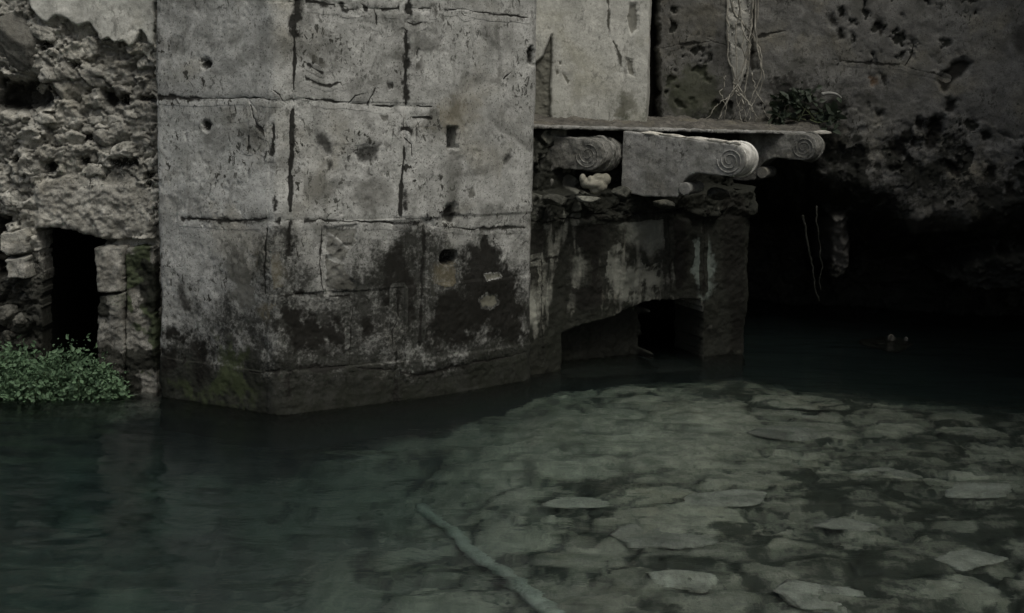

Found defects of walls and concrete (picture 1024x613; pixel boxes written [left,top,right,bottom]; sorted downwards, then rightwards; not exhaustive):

spalling [36,41,55,52]
spalling [0,71,62,118]
spalling [97,87,157,111]
spalling [38,157,59,175]
spalling [76,130,95,169]
spalling [106,155,155,190]
crack [157,0,712,383]
damp [173,277,194,315]
damp [212,231,295,333]
damp [529,204,695,334]
damp [713,188,755,354]
damp [159,331,219,394]